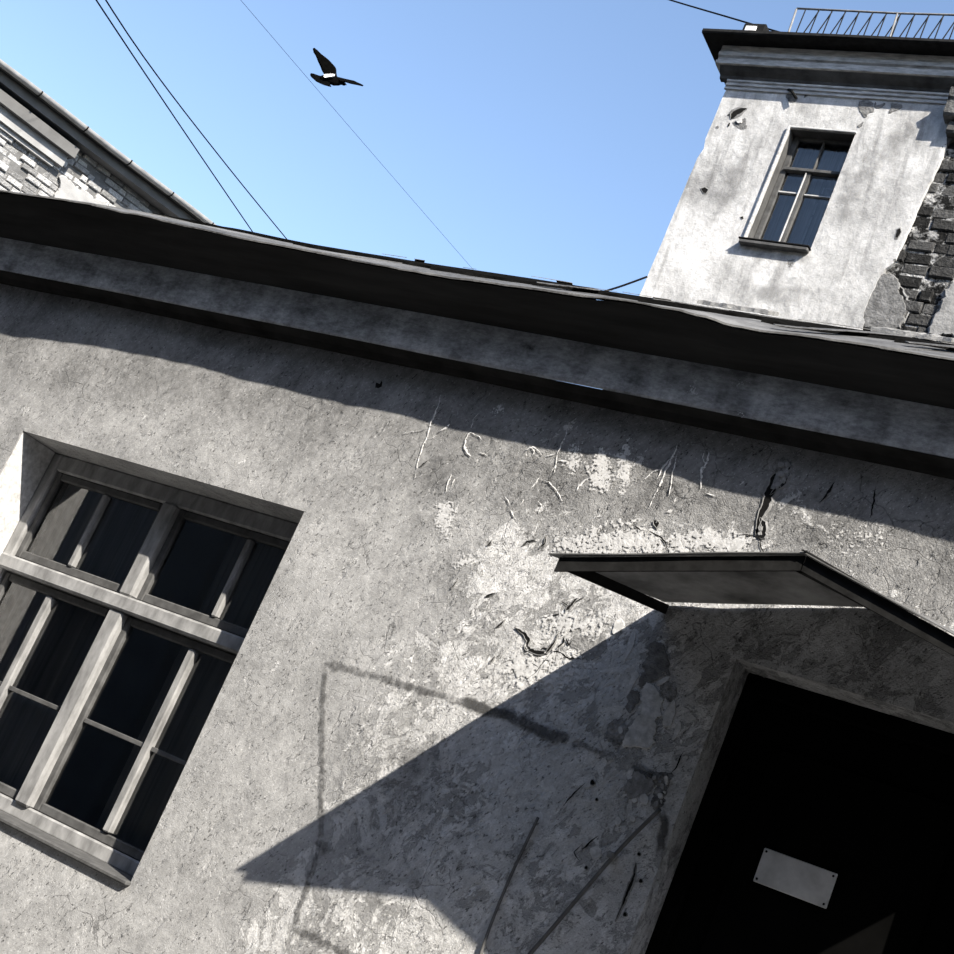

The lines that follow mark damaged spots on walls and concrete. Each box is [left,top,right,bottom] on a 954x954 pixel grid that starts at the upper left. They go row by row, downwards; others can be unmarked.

spalling [716,106,747,129]
peeling [857,99,902,127]
crack [396,391,488,475]
crack [503,422,592,517]
crack [641,443,678,513]
crack [700,453,718,497]
crack [736,458,793,552]
crack [515,597,584,679]
peeling [489,607,636,691]
peeling [604,641,682,749]
peeling [623,771,673,810]